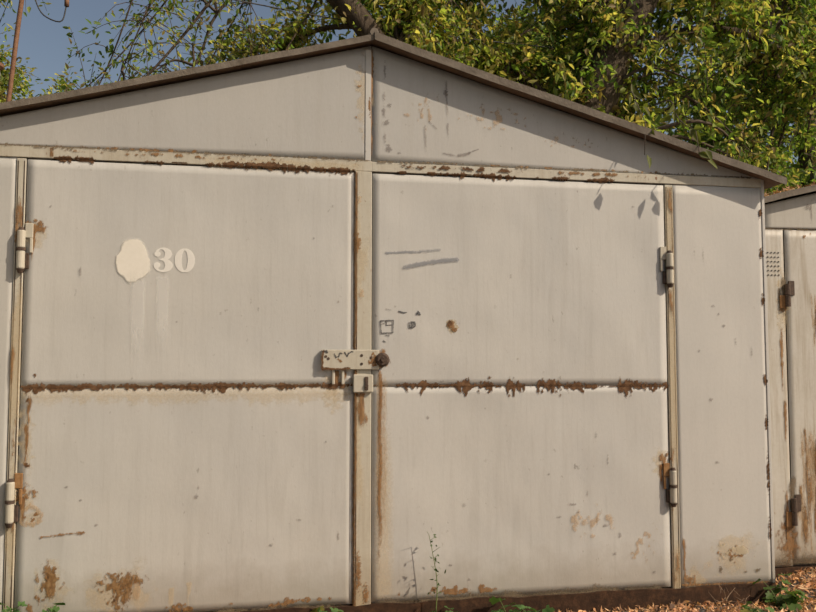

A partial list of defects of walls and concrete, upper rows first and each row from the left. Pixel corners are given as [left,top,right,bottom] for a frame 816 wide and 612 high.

rust [50,148,96,164]
rust [427,172,516,182]
rust [14,202,46,255]
rust [446,320,459,333]
rust [396,376,668,397]
rust [374,349,390,542]
rust [659,449,674,482]
rust [11,486,36,531]
rust [21,370,369,612]
rust [768,429,816,560]
rust [379,584,661,603]